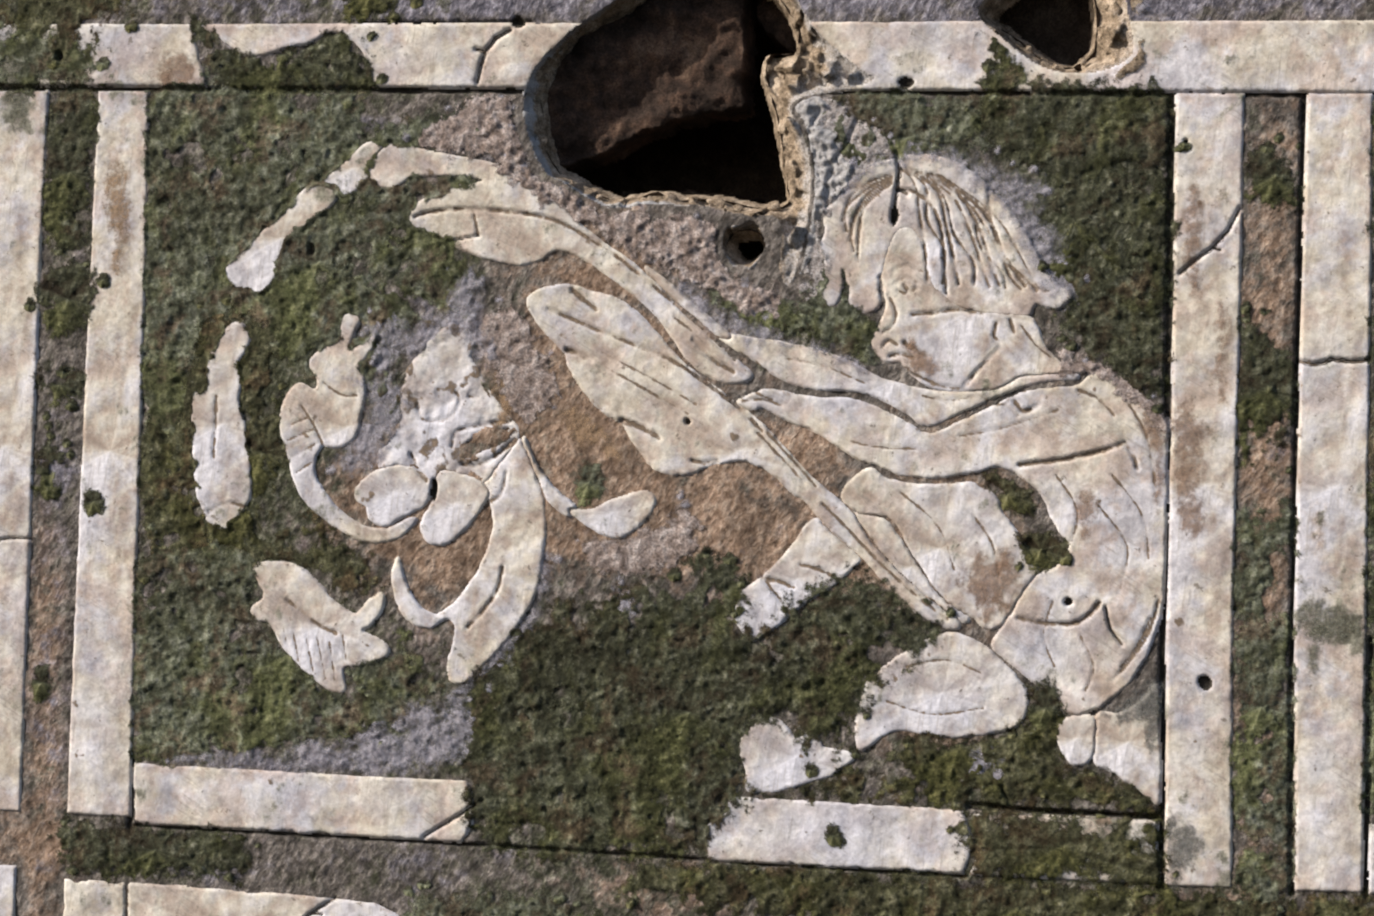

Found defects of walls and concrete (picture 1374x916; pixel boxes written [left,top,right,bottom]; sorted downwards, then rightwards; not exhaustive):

spalling [978,0,1150,80]
spalling [402,0,1089,343]
crack [1180,209,1241,274]